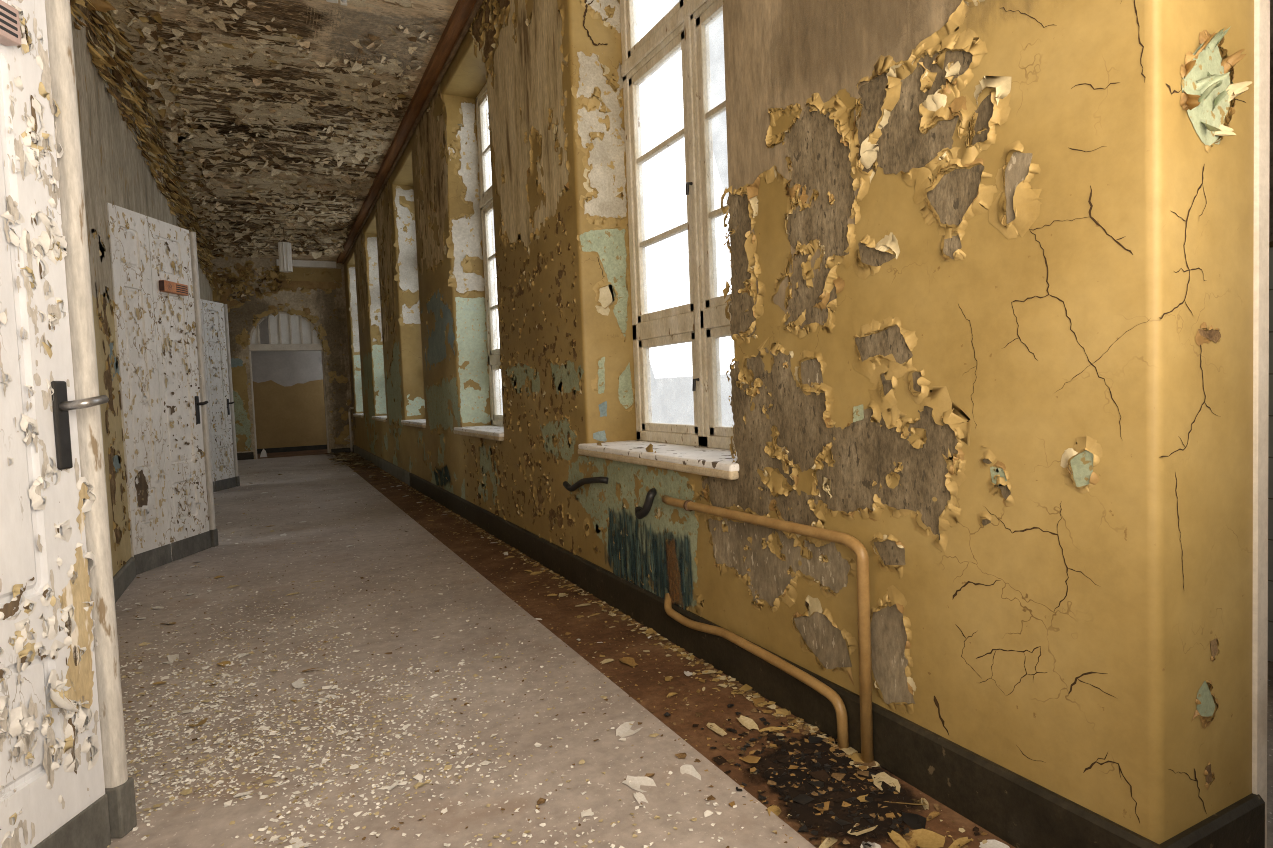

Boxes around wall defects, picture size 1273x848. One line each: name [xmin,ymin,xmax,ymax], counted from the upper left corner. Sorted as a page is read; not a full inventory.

peeling [1180,26,1252,153]
peeling [0,0,101,809]
peeling [70,0,1043,714]
crack [958,164,1207,441]
flaking render [1195,322,1221,346]
peeling [1060,434,1103,494]
crack [1159,345,1221,588]
crack [985,501,1096,611]
crack [953,580,1116,698]
crack [934,696,949,735]
peeling [1192,680,1219,729]
peeling [0,807,35,848]